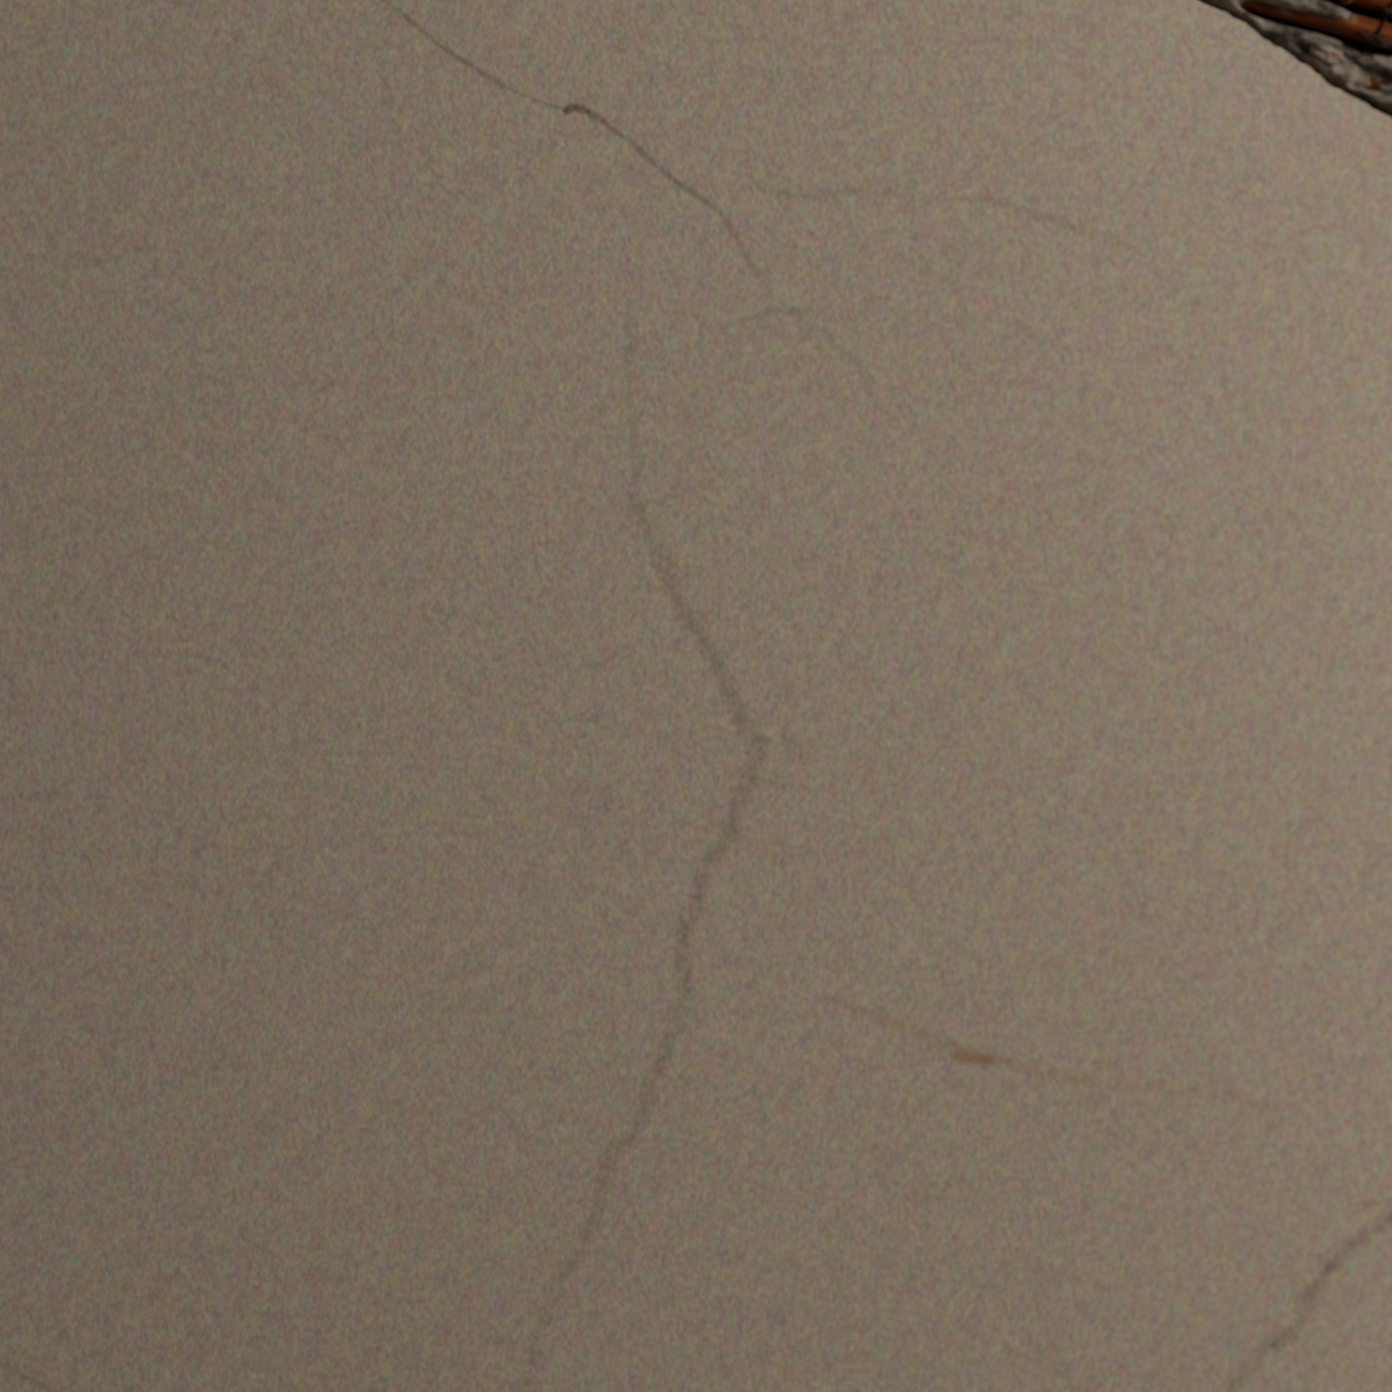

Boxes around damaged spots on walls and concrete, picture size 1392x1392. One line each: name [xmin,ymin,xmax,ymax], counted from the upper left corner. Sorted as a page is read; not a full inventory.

spalling [1199,0,1392,118]